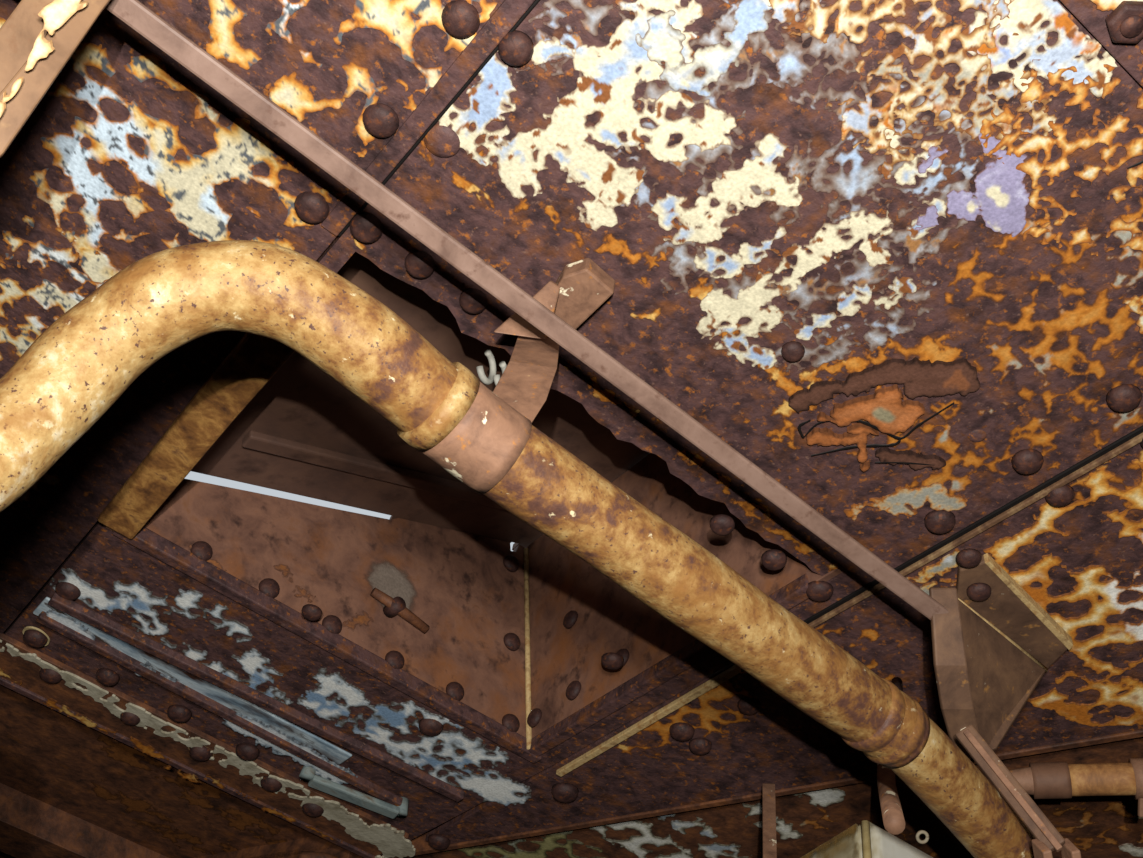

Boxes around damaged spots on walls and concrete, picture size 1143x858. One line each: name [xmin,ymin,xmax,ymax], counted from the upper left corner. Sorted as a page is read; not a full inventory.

peeling [0,0,88,118]
peeling [0,42,314,361]
corrosion [451,171,494,208]
corrosion [544,205,667,284]
peeling [439,0,1143,372]
corrosion [630,308,661,322]
corrosion [757,197,1143,496]
corrosion [716,473,840,571]
peeling [983,456,1143,727]
peeling [46,568,532,806]
corrosion [615,671,779,758]
peeling [443,813,752,858]